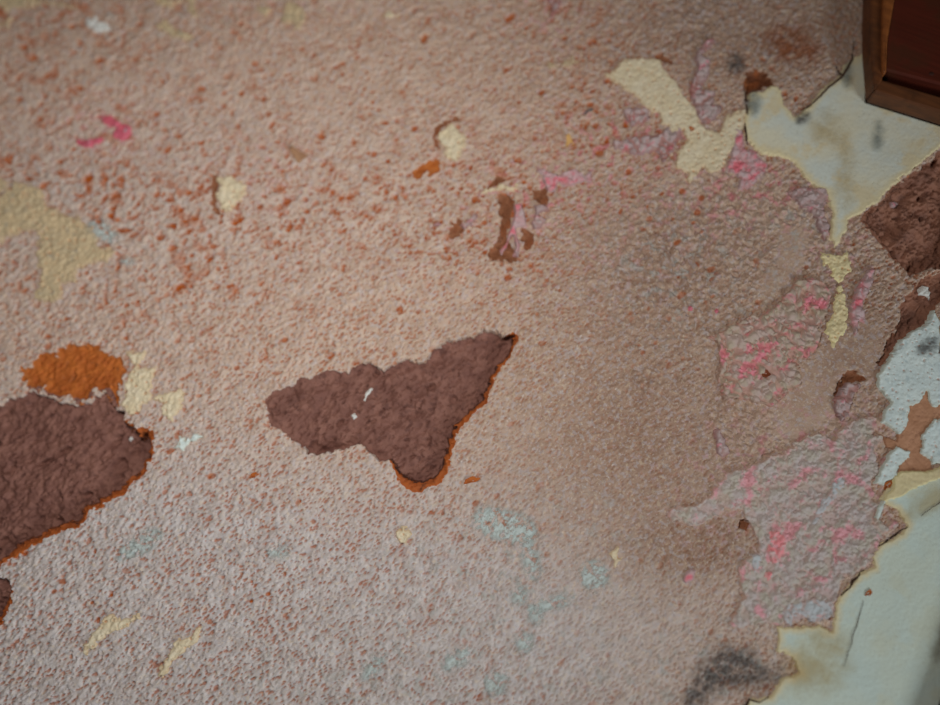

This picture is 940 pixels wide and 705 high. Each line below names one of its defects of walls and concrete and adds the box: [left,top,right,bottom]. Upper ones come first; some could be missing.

flaking render [480,176,534,263]
peeling [605,53,940,705]